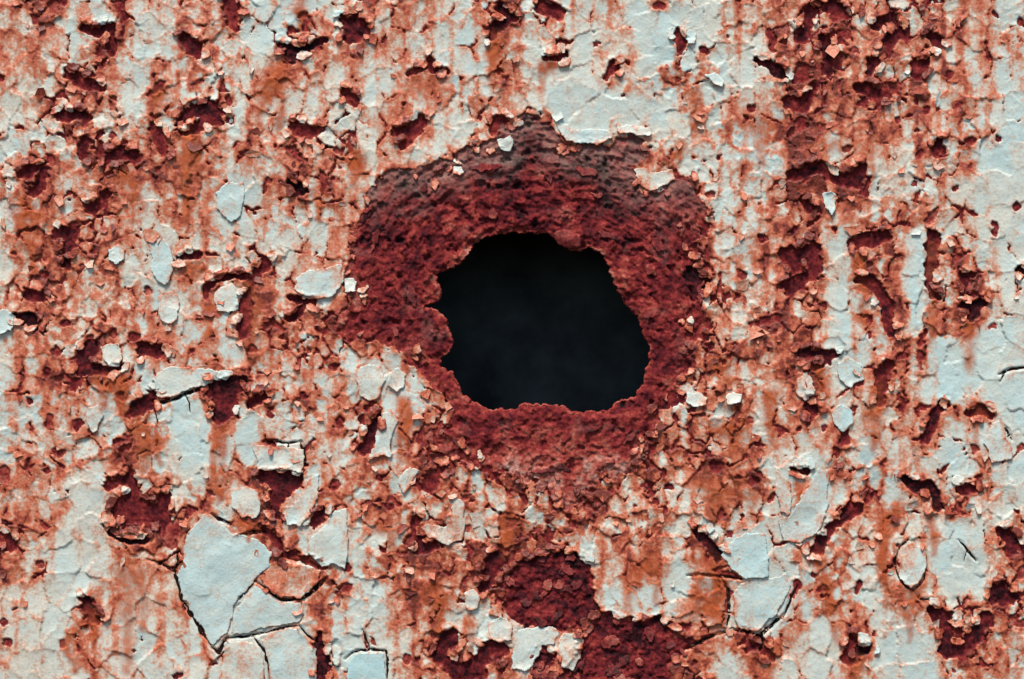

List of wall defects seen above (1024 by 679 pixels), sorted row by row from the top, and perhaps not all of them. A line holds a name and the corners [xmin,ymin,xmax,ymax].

corrosion [146,80,166,123]
corrosion [333,136,366,182]
corrosion [109,329,141,341]
peeling [68,229,299,436]
peeling [196,235,369,346]
spalling [425,232,650,413]
peeling [101,443,368,679]
crack [149,549,327,673]
crack [347,630,389,678]
corrosion [496,543,742,679]
crack [686,573,799,651]
crack [894,539,929,600]